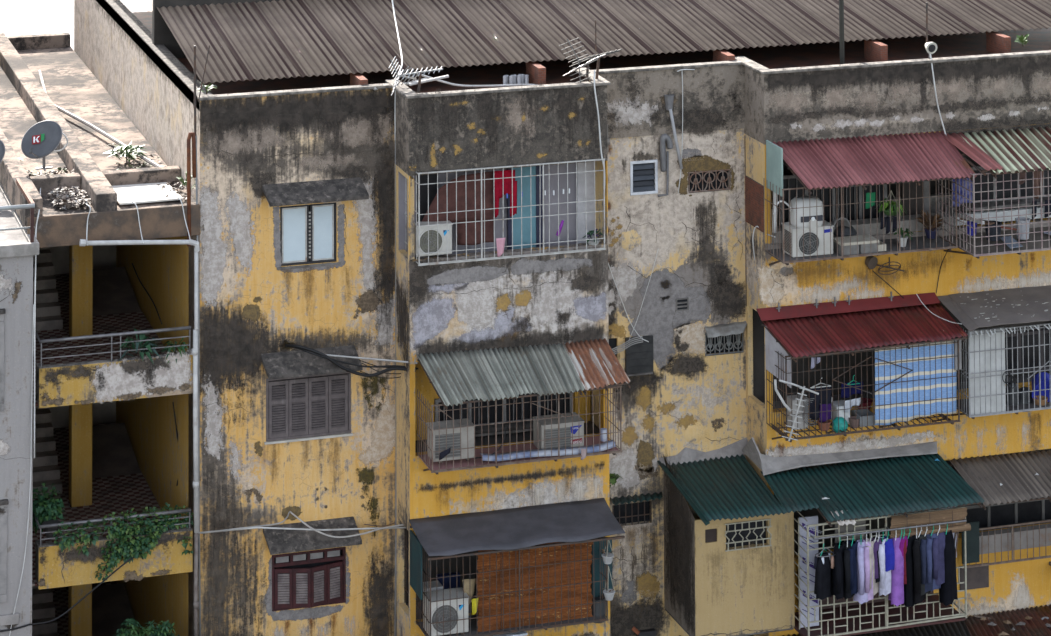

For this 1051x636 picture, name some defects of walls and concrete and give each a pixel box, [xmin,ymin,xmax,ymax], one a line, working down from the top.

water stain [408,76,640,162]
water stain [766,56,1051,108]
peeling [198,182,256,307]
peeling [300,115,395,347]
water stain [200,84,617,423]
peeling [412,262,642,349]
crack [627,188,743,332]
water stain [706,265,746,319]
peeling [42,350,263,504]
peeling [609,385,697,489]
water stain [345,552,395,636]
water stain [610,453,696,636]